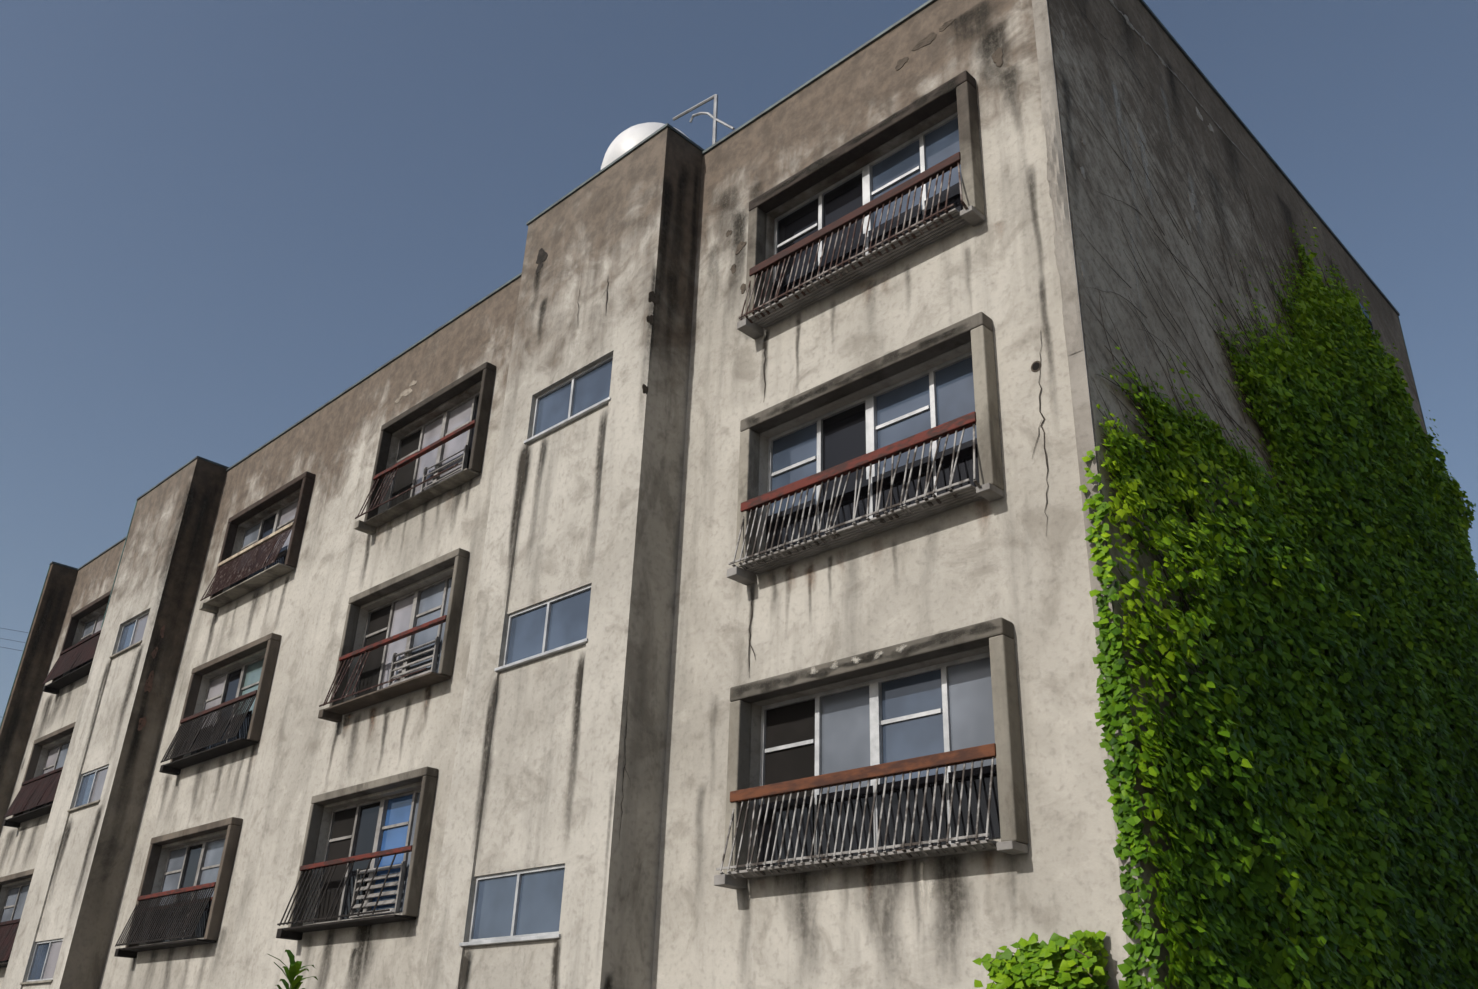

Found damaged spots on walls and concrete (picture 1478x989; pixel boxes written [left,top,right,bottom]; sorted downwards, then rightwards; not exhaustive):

crack [1074,0,1266,180]
water stain [648,171,697,352]
water stain [157,487,216,613]
water stain [119,636,162,761]
water stain [738,654,872,694]
water stain [794,862,810,932]
water stain [866,861,899,931]
water stain [920,856,965,933]